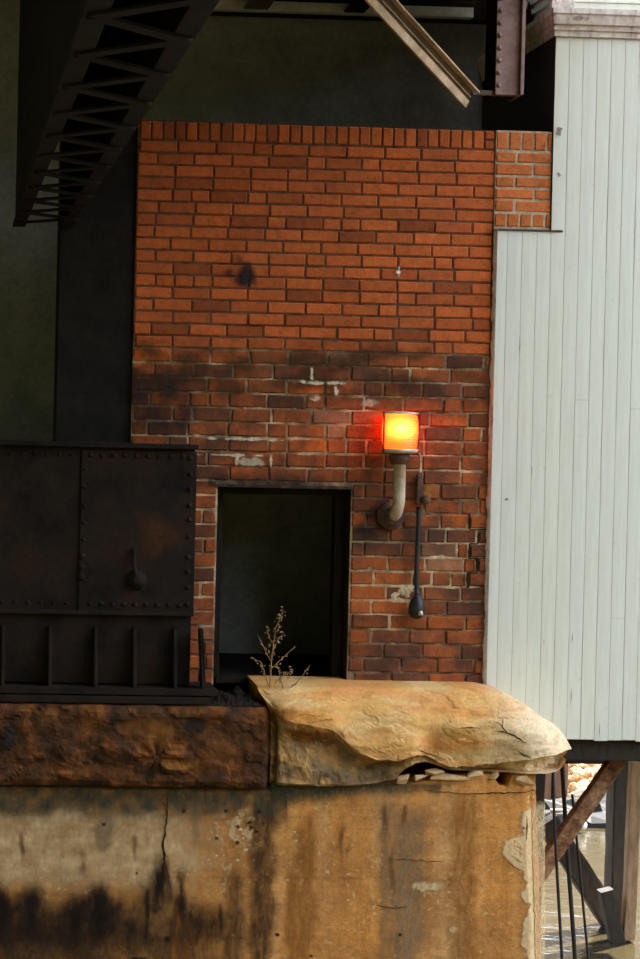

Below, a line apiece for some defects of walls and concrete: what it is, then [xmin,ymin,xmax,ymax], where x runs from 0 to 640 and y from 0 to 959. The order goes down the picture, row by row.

crack [145,796,170,936]
leakage [0,782,442,959]
corrosion [287,820,314,959]
peeling [502,808,545,959]